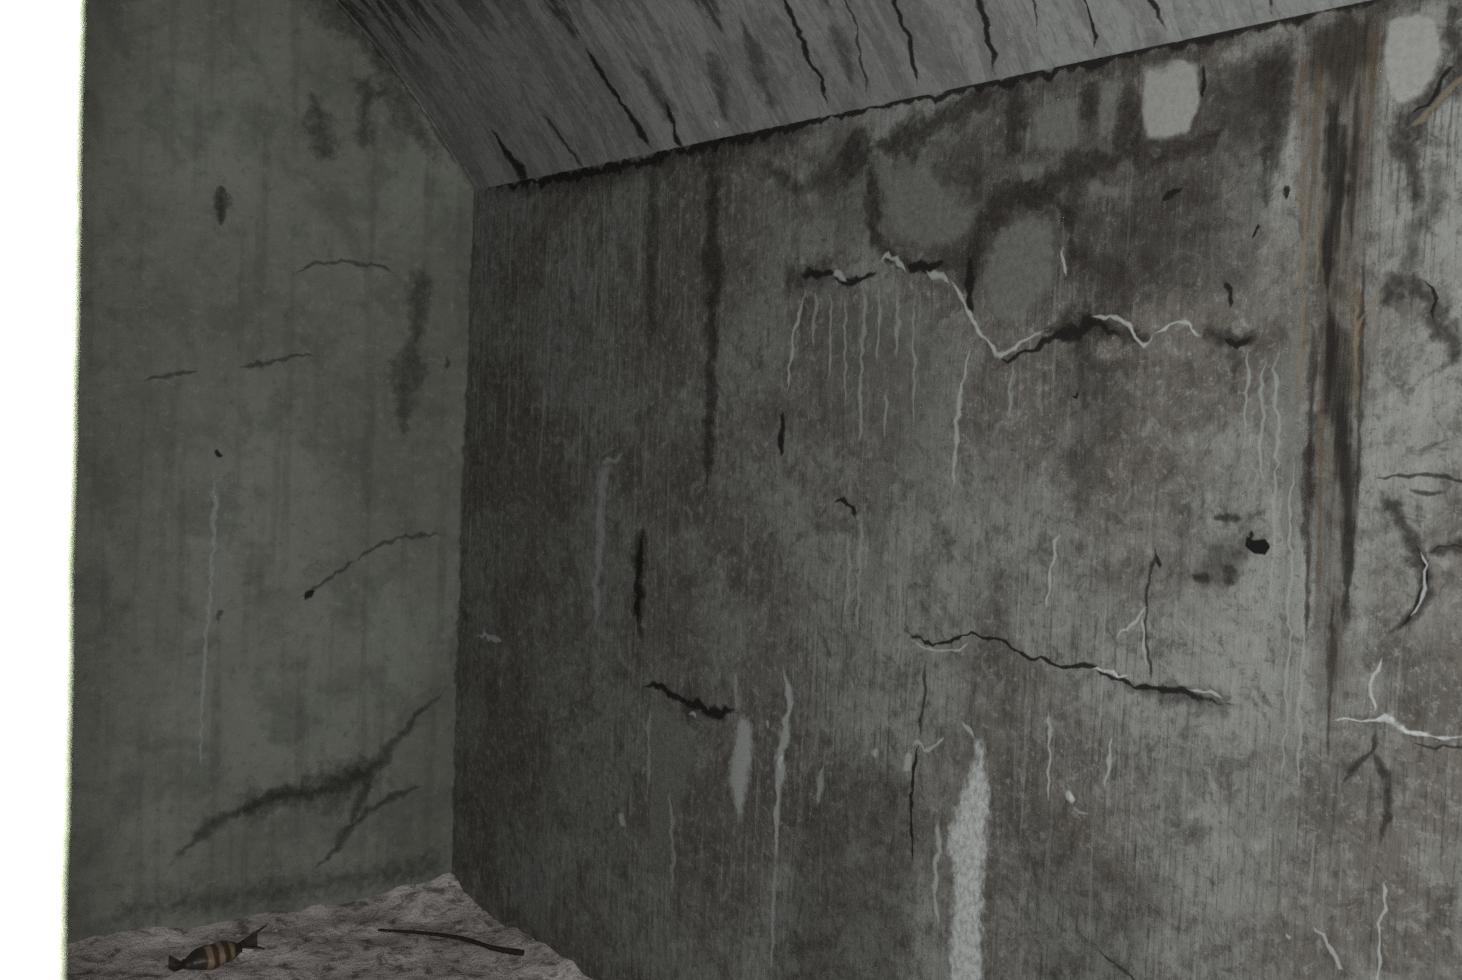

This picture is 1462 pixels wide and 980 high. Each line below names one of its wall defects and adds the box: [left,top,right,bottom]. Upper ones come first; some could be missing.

water stain [845,88,990,273]
crack [488,0,1378,191]
water stain [965,82,1219,312]
water stain [1261,49,1294,168]
water stain [812,290,917,438]
crack [778,252,1256,455]
crack [645,681,733,720]
efflorescence [904,738,943,858]
efflorescence [932,722,990,980]
crack [911,551,1221,732]
crack [1336,660,1462,836]
crack [1383,473,1462,629]